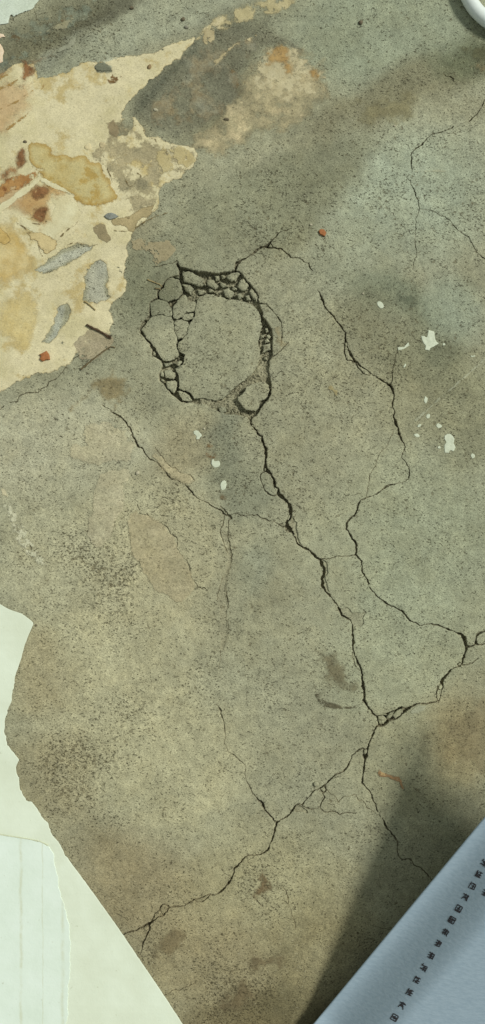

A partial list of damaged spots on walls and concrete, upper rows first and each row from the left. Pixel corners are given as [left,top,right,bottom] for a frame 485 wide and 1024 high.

peeling [0,0,329,419]
crack [406,100,485,270]
crack [102,228,485,954]